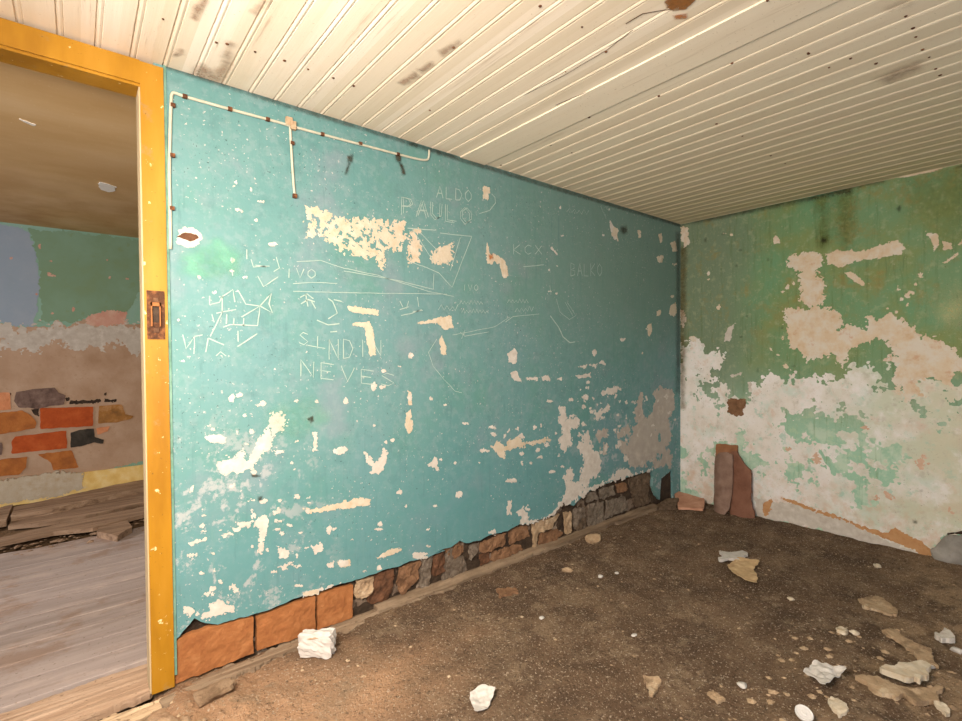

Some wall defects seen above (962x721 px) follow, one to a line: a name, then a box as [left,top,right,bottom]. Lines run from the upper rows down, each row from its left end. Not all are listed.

corrosion [665,0,695,19]
peeling [303,205,458,270]
peeling [925,231,962,263]
peeling [0,307,143,504]
peeling [174,240,962,684]
peeling [707,690,726,704]
peeling [828,696,849,718]
peeling [934,701,950,717]